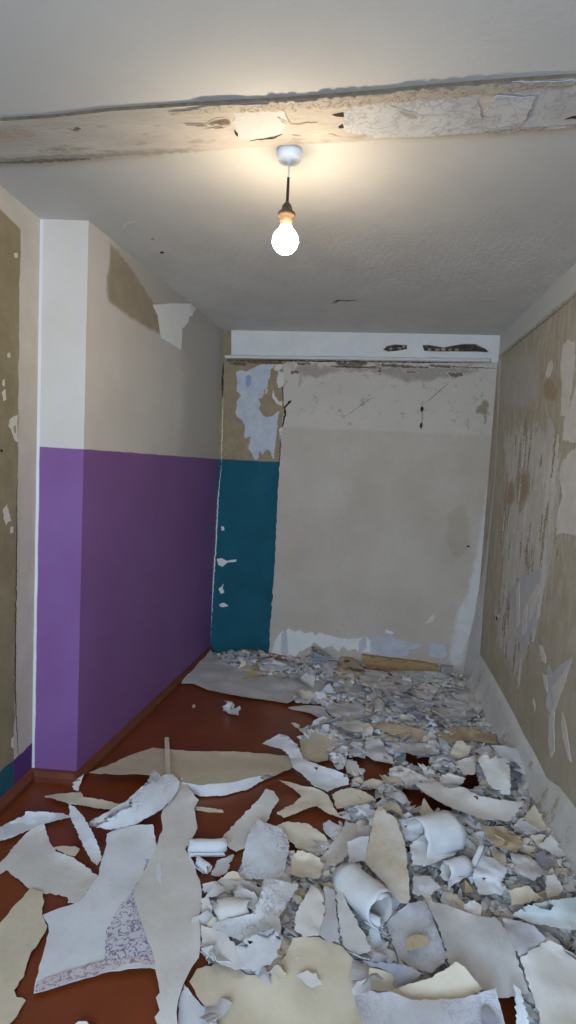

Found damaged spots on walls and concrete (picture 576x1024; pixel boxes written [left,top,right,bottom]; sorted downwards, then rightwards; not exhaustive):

flaking render [105,240,163,337]
spalling [423,344,487,352]
peeling [8,415,18,442]
peeling [235,364,284,460]
crack [277,386,292,499]
peeling [3,505,13,533]
peeling [493,339,576,762]
peeling [271,628,447,658]